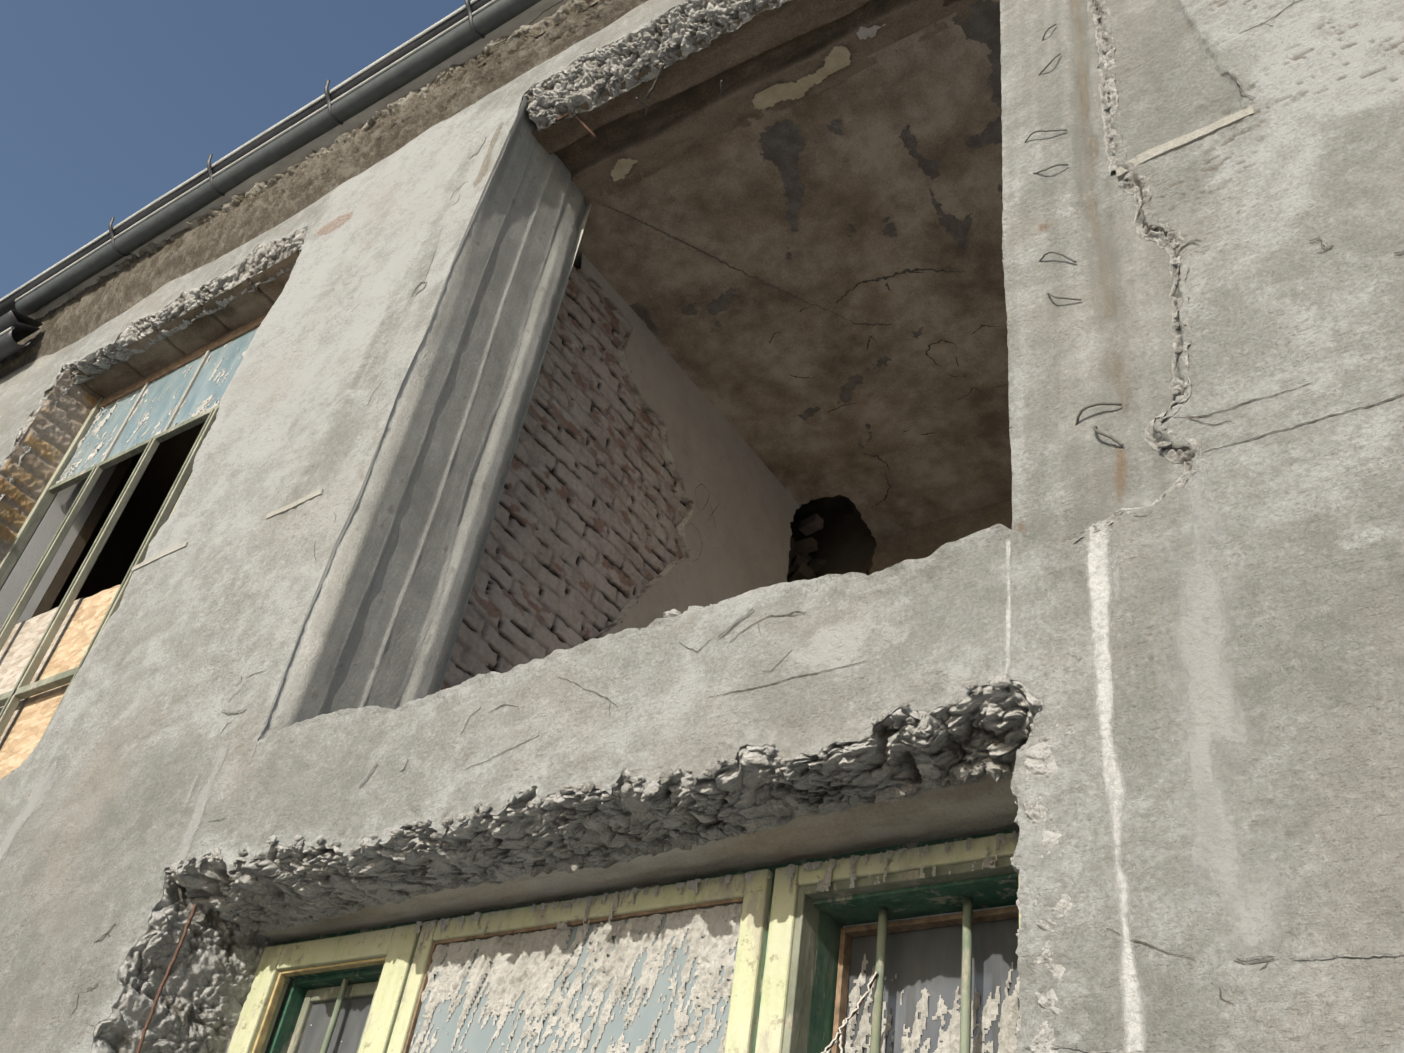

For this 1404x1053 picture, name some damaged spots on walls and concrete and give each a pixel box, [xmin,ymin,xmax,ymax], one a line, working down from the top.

spalling [0,0,793,501]
peeling [758,119,806,260]
peeling [899,124,973,251]
crack [1172,238,1201,269]
crack [925,325,1009,399]
spalling [441,265,694,690]
spalling [787,495,858,582]
water stain [1086,522,1145,1053]
spalling [91,674,1075,1053]